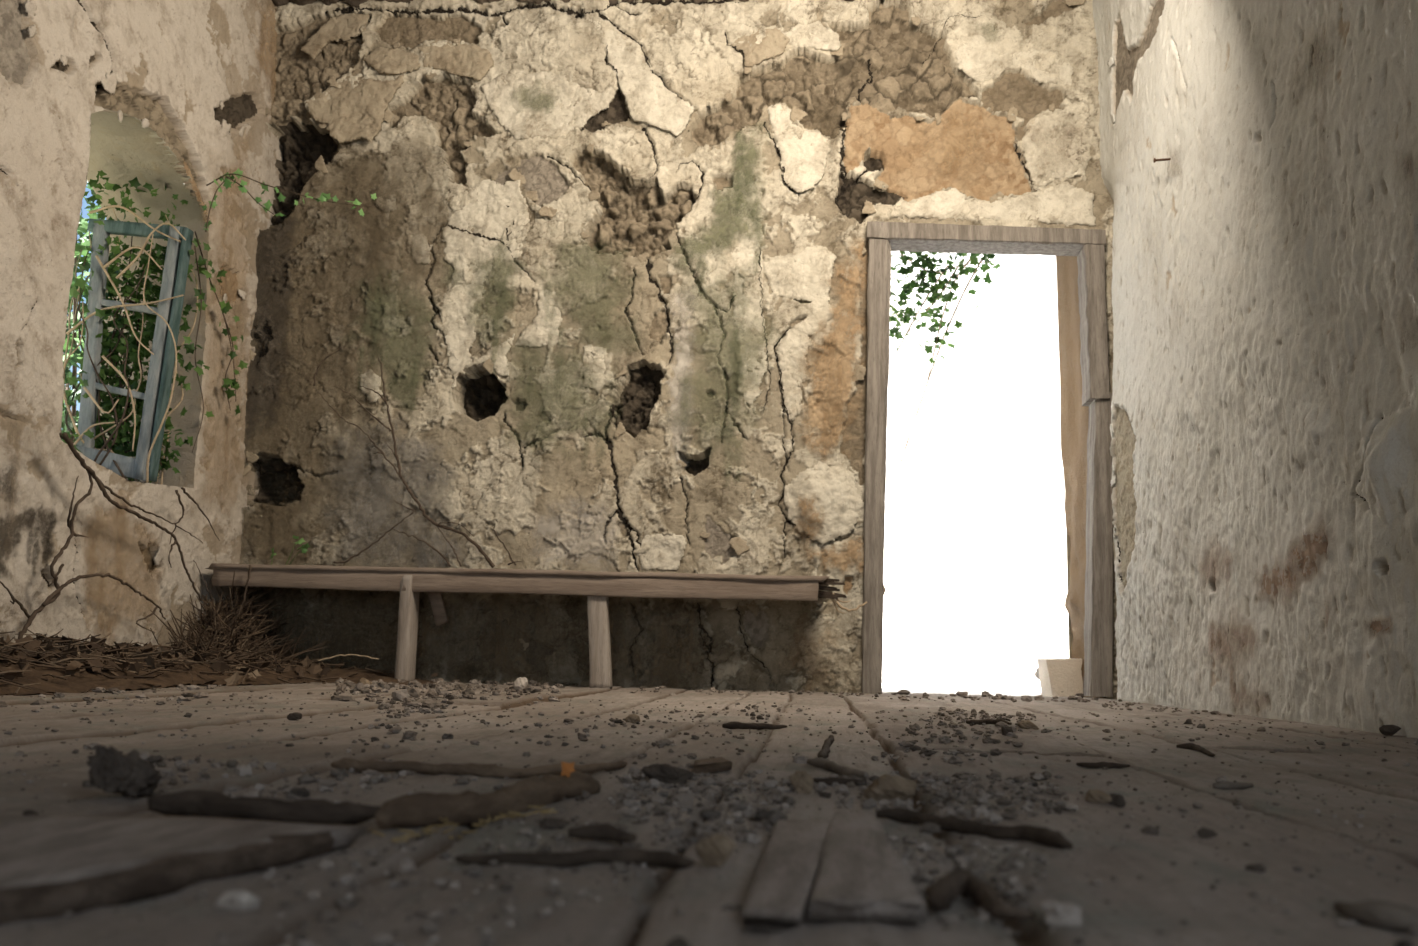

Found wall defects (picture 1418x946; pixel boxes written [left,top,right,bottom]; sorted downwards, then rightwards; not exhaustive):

flaking render [1107,0,1165,124]
crack [547,156,602,206]
flaking render [214,0,1096,422]
crack [642,127,705,199]
crack [763,122,799,196]
crack [835,59,873,213]
crack [424,206,533,366]
spalling [581,344,665,438]
crack [503,236,819,576]
water stain [668,260,704,463]
water stain [0,508,56,574]
crack [697,603,770,687]